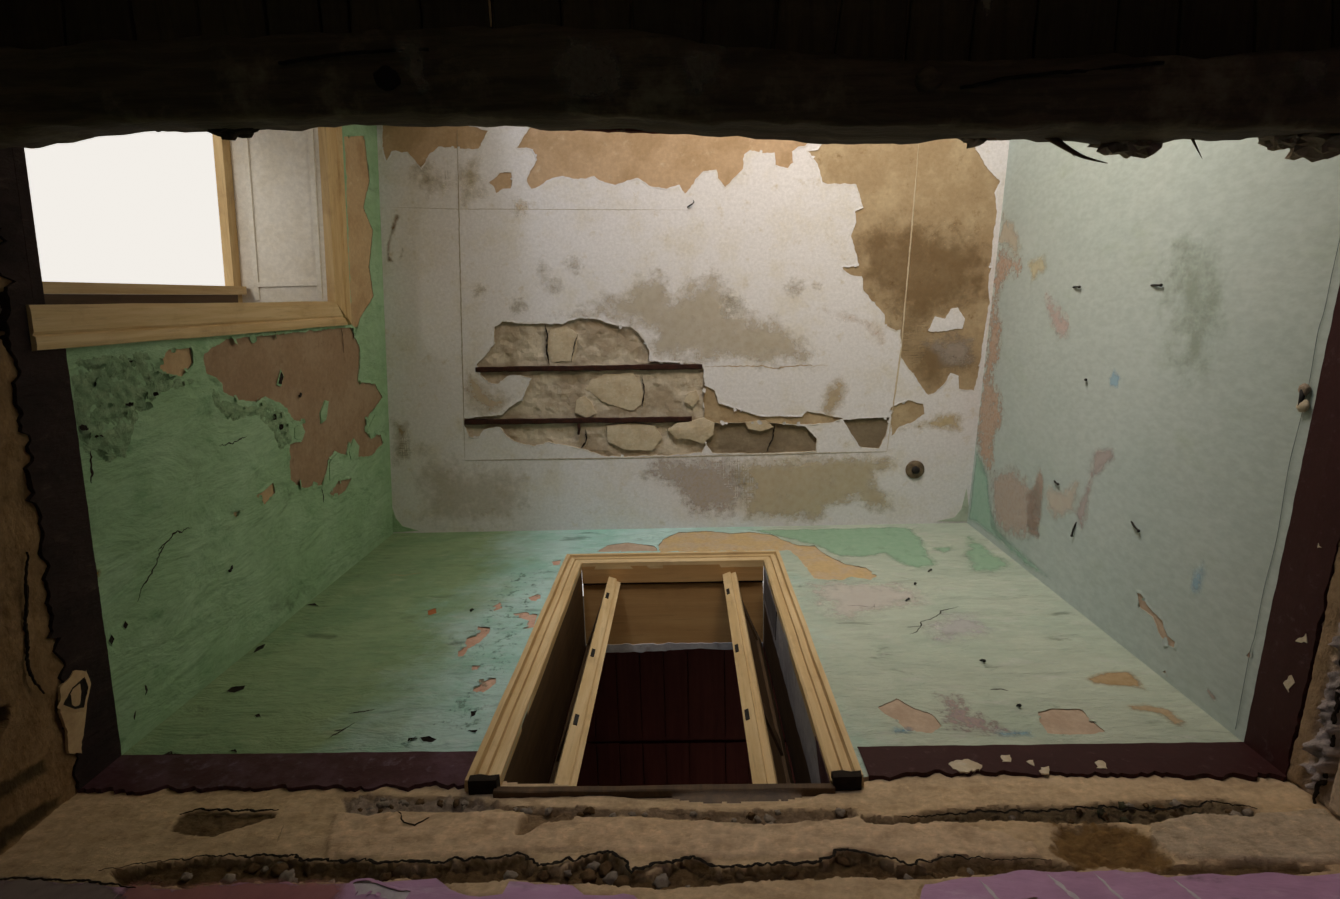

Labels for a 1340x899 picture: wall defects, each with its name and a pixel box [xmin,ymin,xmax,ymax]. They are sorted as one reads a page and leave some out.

peeling [153,125,490,508]
peeling [462,127,1002,458]
crack [0,807,1051,888]
flaking render [0,331,1340,899]
crack [902,800,1257,818]
crack [1312,660,1340,804]